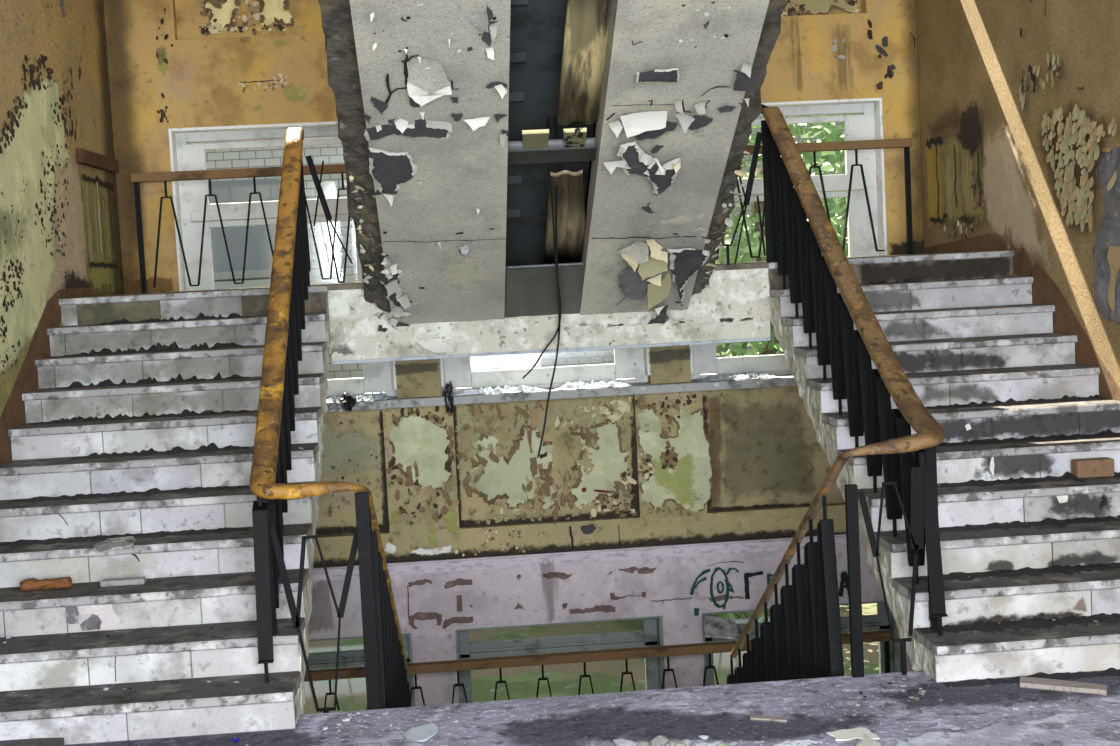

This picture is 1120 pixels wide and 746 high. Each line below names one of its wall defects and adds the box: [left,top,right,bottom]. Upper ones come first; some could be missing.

peeling [156,8,173,64]
peeling [237,73,287,93]
spalling [318,0,509,353]
spalling [603,0,896,331]
leakage [891,0,984,255]
peeling [1019,53,1061,110]
peeling [1041,86,1120,327]
peeling [385,394,713,557]